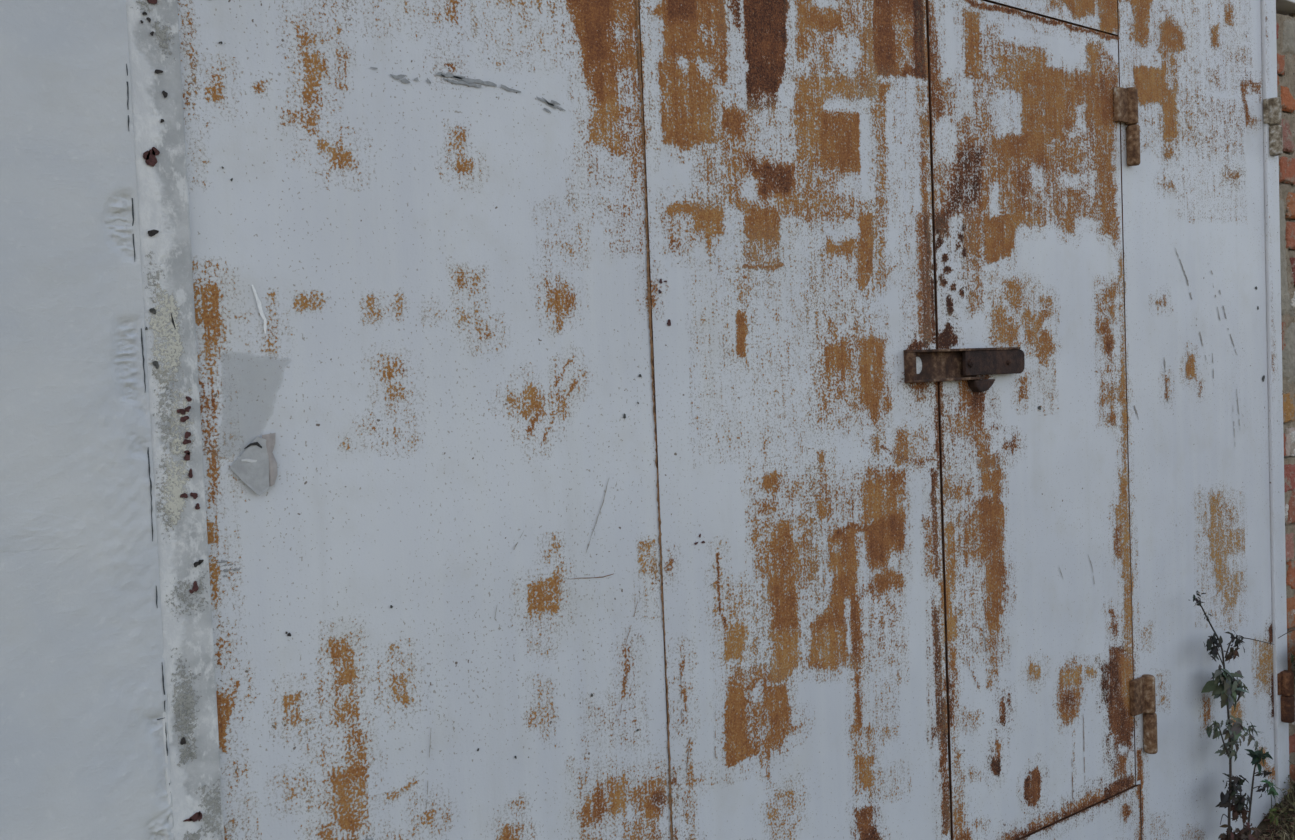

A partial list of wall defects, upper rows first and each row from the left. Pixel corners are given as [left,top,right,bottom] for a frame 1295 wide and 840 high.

rust [192,260,456,840]
rust [276,0,1275,840]